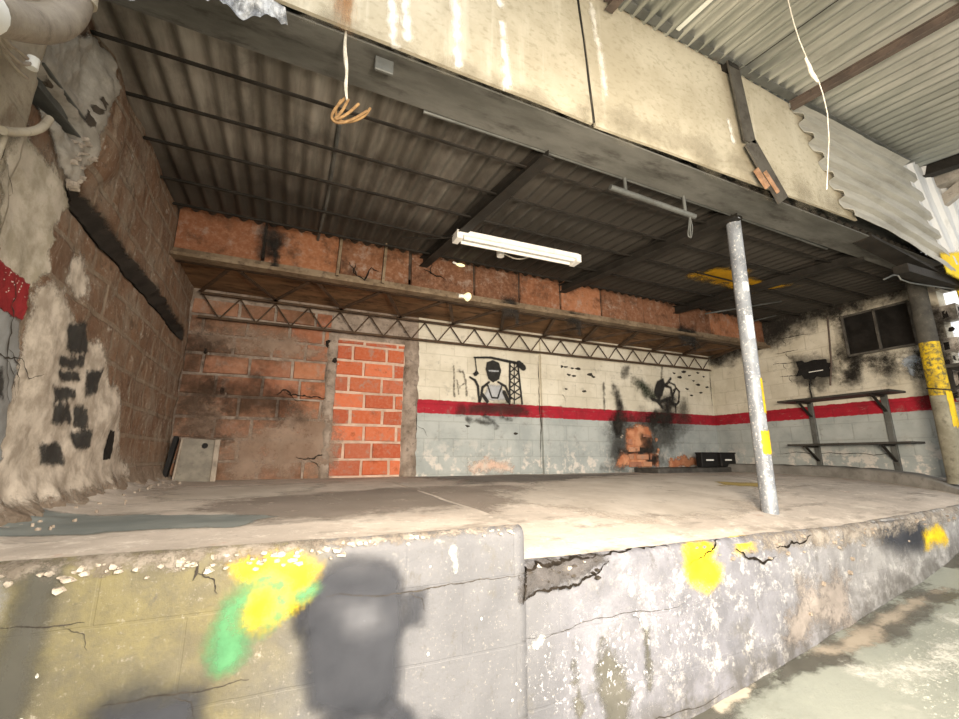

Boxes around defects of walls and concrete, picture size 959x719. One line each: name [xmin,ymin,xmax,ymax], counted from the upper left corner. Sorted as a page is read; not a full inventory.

peeling [0,34,130,512]
peeling [468,459,514,473]
spalling [617,424,697,468]
spalling [518,553,609,605]
crack [544,545,668,561]
crack [691,535,810,565]
water stain [943,552,959,568]
water stain [851,582,959,641]
water stain [571,662,585,719]
water stain [595,637,634,719]
water stain [644,630,652,690]
water stain [691,635,857,719]